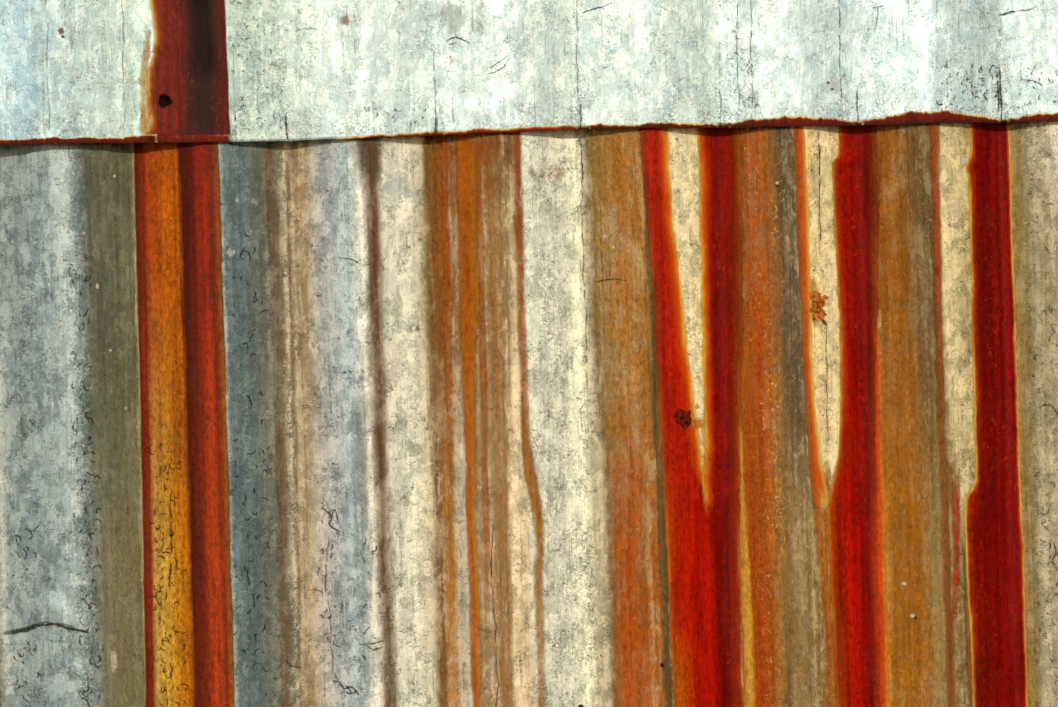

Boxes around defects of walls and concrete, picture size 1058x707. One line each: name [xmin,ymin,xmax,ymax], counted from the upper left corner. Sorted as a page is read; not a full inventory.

rust [0,0,234,707]
rust [336,110,1058,707]